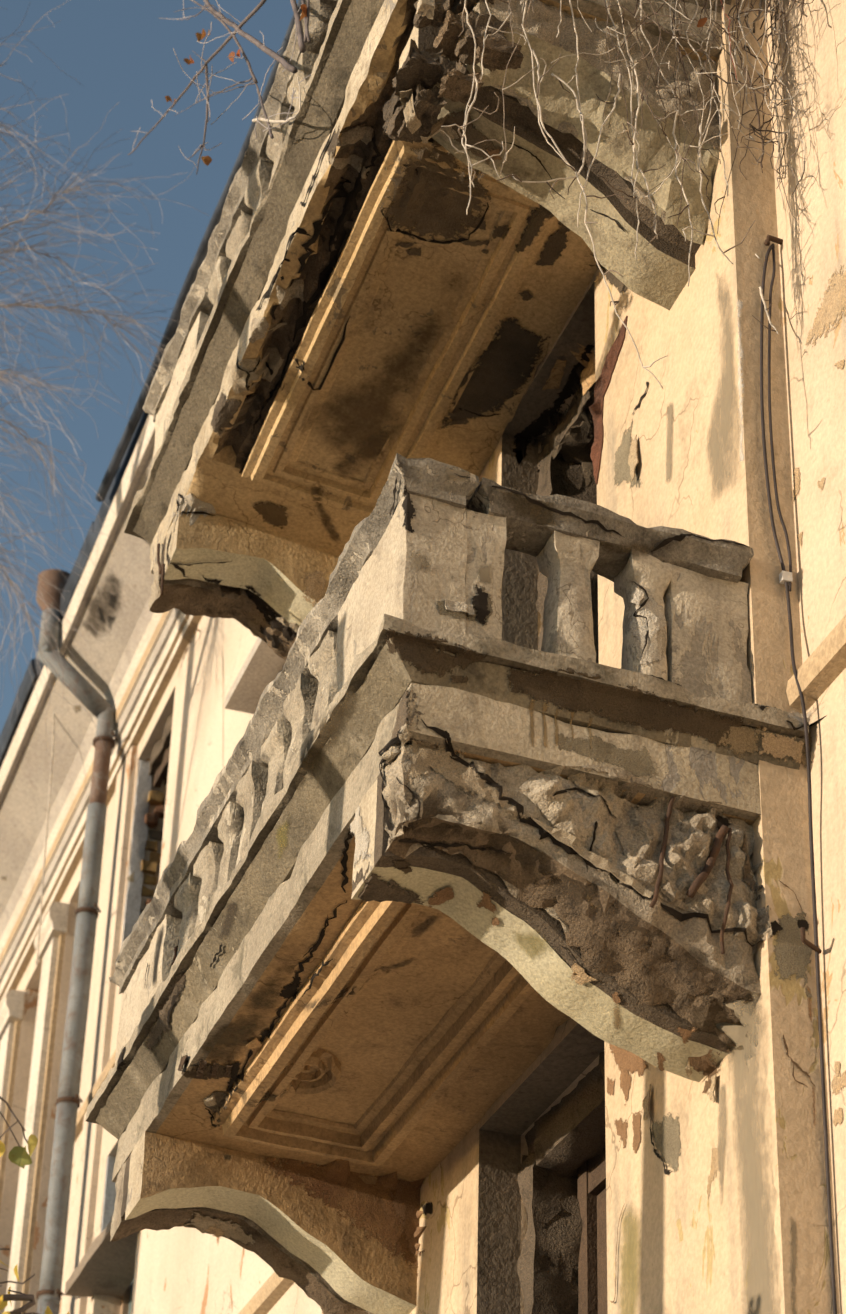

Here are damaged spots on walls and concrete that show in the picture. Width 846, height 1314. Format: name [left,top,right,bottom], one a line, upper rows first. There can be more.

spalling [380,89,570,266]
damp [326,320,437,474]
spalling [441,316,641,488]
damp [708,292,744,492]
damp [84,577,120,635]
crack [157,534,231,676]
damp [253,500,288,529]
crack [454,473,623,537]
crack [651,534,749,552]
spalling [378,686,812,998]
crack [229,900,347,1102]
peeling [607,1044,681,1174]